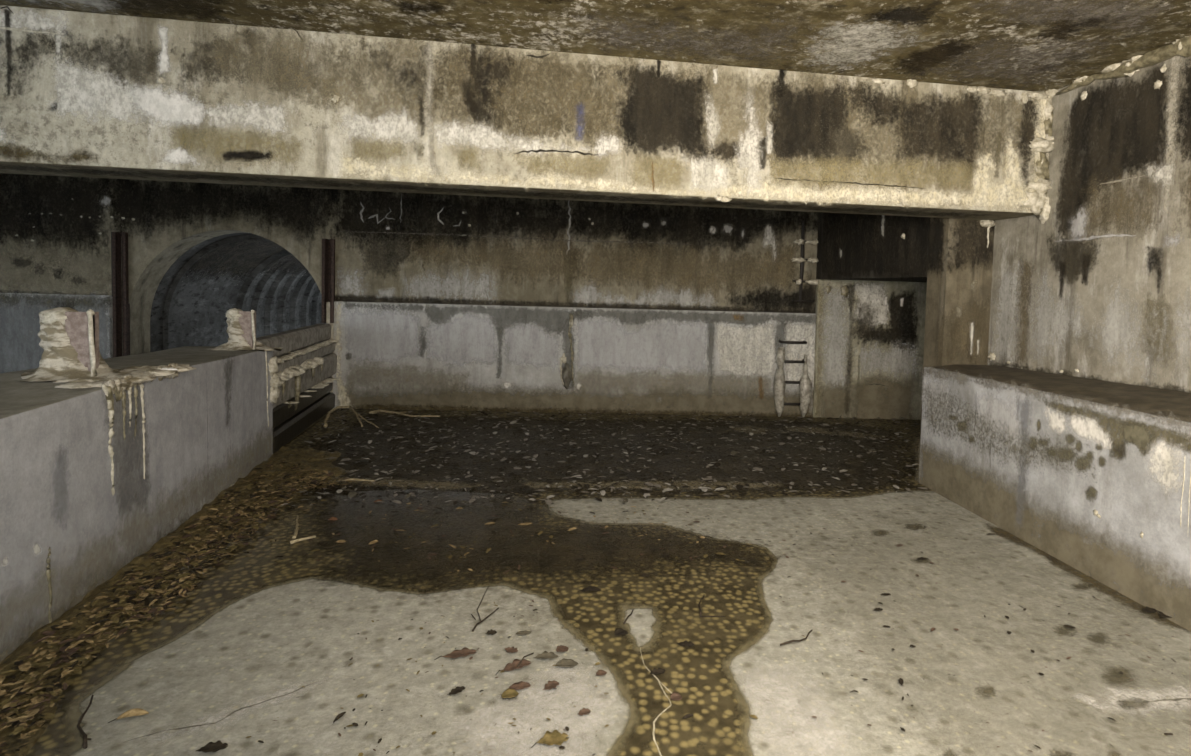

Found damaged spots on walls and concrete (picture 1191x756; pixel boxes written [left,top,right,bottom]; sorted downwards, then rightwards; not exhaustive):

leakage [0,0,1191,510]
leakage [0,414,327,662]
leakage [59,575,641,756]
leakage [543,445,1191,756]